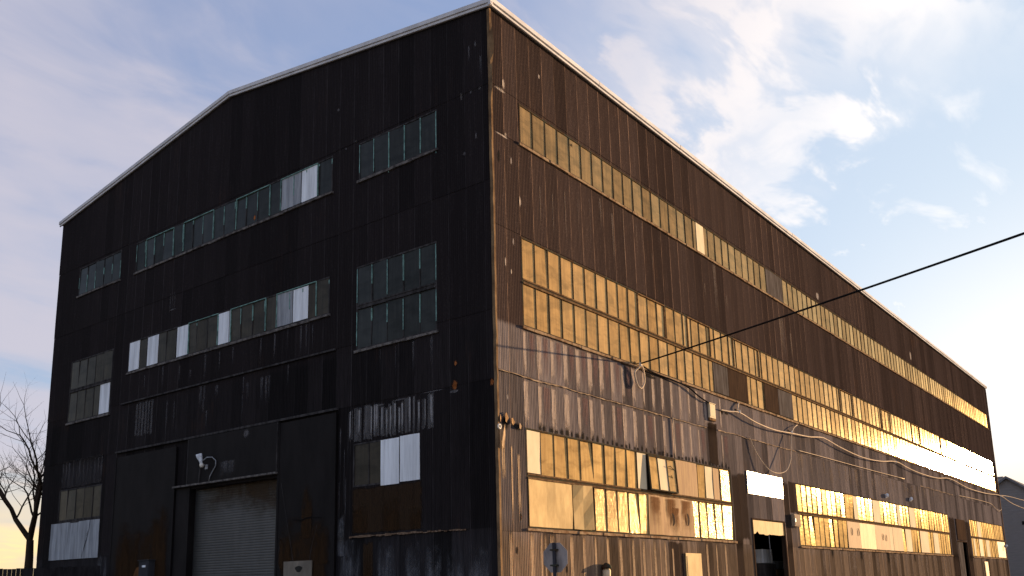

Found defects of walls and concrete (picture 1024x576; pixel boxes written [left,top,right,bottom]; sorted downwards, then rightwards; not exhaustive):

peeling [349,389,442,442]
rust [651,497,690,524]